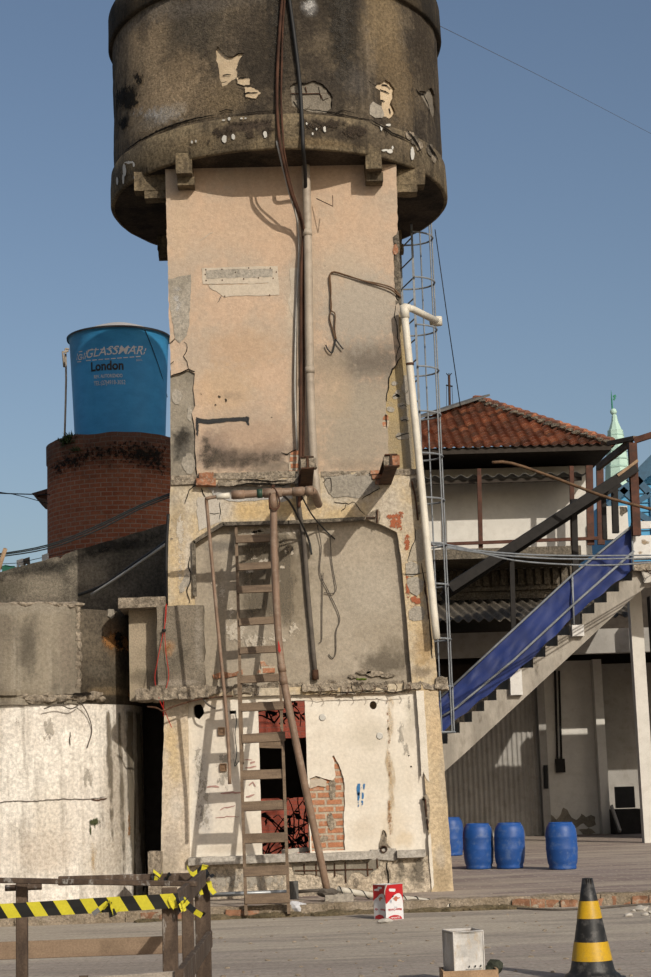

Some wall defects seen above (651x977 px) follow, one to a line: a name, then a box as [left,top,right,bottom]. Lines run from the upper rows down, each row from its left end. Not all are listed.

leakage [115,71,162,130]
spalling [216,47,261,99]
spalling [290,82,367,139]
spalling [369,81,393,118]
peeling [169,274,191,343]
spalling [170,370,299,531]
leakage [203,438,276,467]
peeling [382,231,433,658]
peeling [324,470,384,499]
spalling [366,509,381,524]
flaking render [292,756,391,883]
peeling [210,871,285,890]